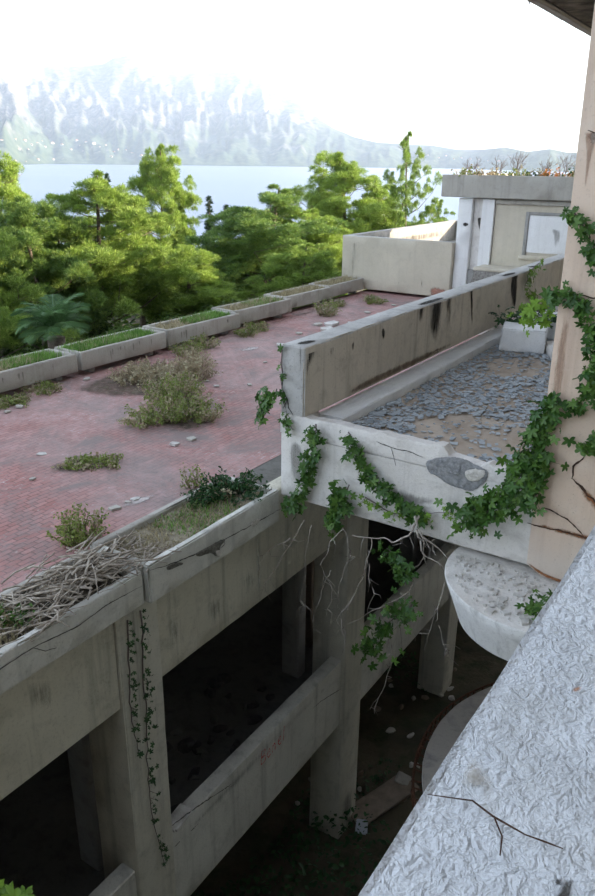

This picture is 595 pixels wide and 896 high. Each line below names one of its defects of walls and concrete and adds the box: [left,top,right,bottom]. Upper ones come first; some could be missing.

damp [546,0,595,28]
damp [502,273,518,307]
spalling [426,457,488,491]
crack [572,457,595,503]
crack [528,508,587,539]